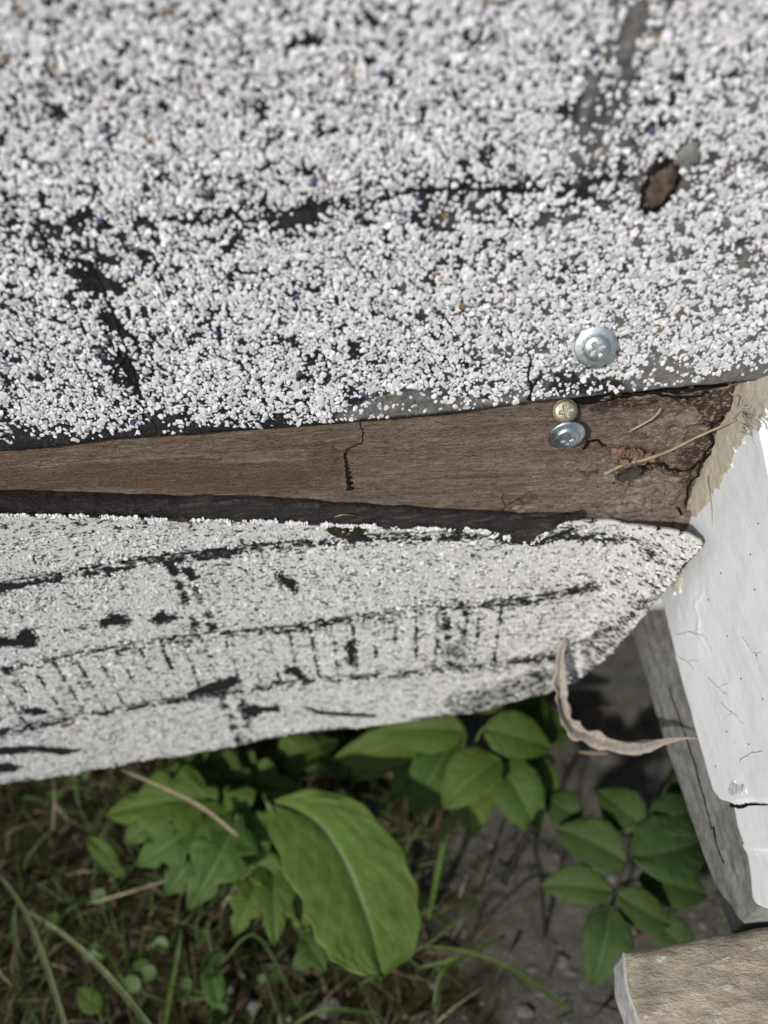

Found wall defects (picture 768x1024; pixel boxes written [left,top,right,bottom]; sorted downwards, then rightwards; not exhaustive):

crack [331,421,364,491]
peeling [544,348,768,531]
crack [669,687,724,864]